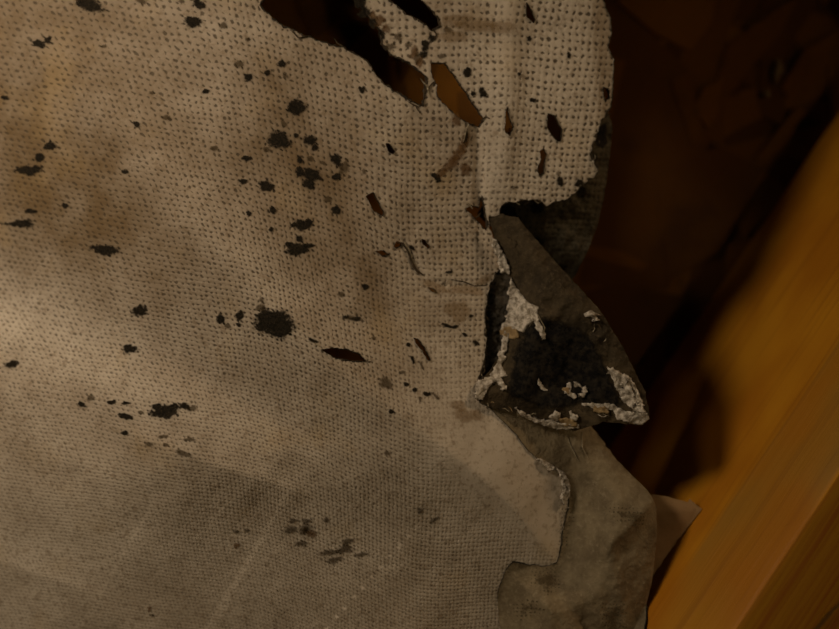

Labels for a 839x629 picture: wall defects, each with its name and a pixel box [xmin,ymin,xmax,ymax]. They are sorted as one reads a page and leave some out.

damp [76,0,109,15]
damp [179,0,205,28]
damp [354,0,436,65]
damp [14,140,58,176]
damp [264,99,350,189]
damp [0,208,37,228]
damp [90,244,122,257]
damp [284,218,315,257]
damp [130,304,147,317]
damp [216,297,299,342]
peeling [473,113,657,629]
damp [107,400,196,420]